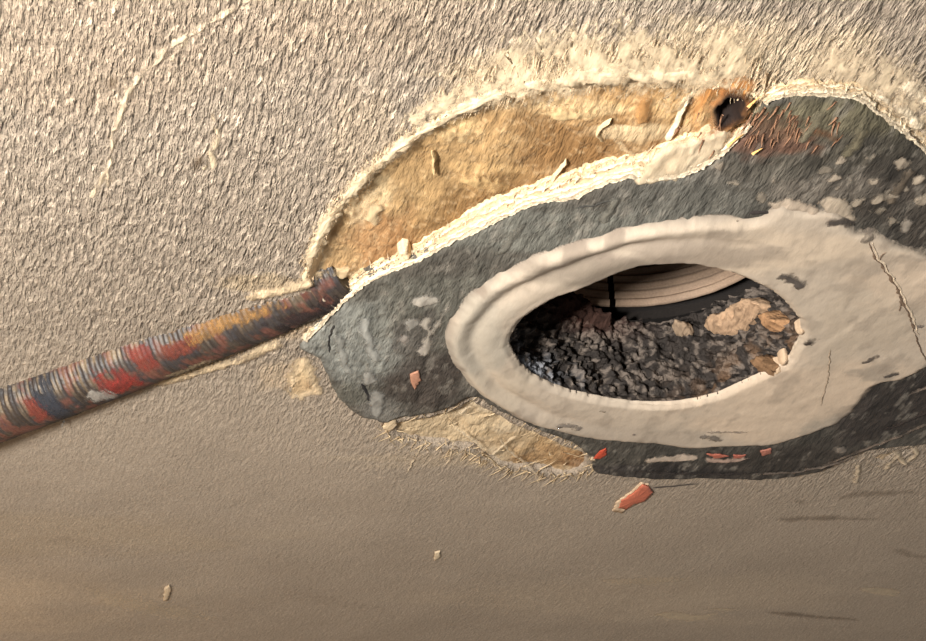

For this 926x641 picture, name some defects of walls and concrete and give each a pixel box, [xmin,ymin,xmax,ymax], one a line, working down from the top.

corrosion [693,77,819,155]
spalling [297,22,926,352]
spalling [283,357,322,400]
spalling [373,397,607,486]